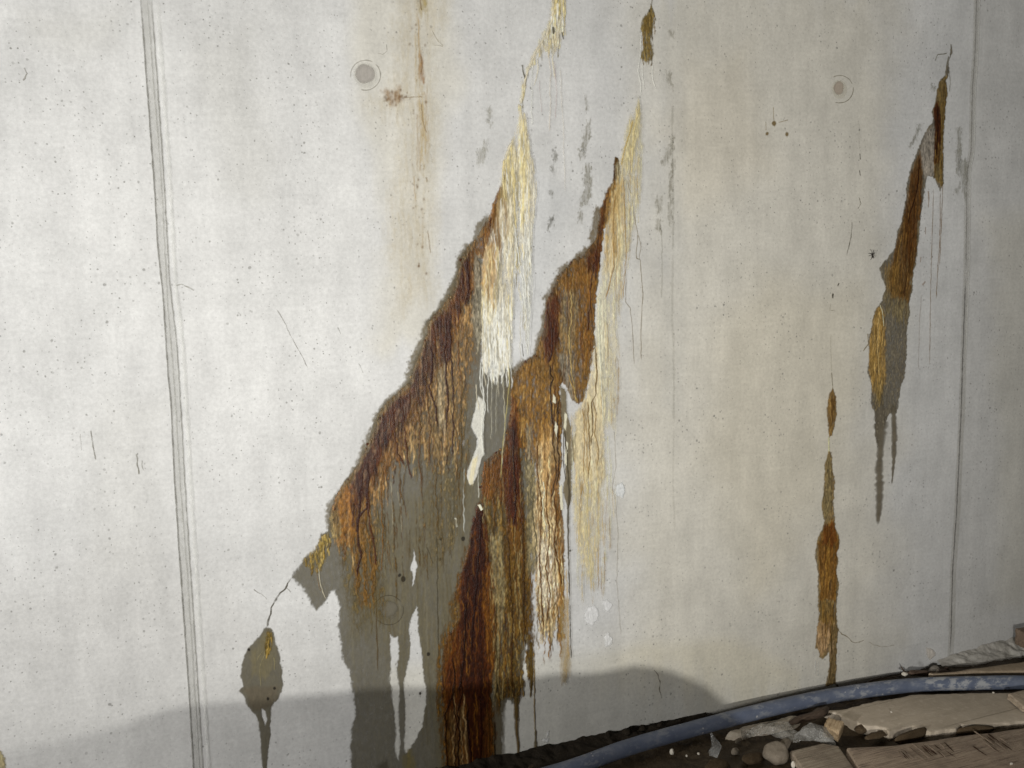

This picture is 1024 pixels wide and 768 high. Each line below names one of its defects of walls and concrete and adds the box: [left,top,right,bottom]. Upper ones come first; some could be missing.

rust [386,89,408,106]
rust [638,3,656,88]
rust [864,46,952,522]
rust [304,157,620,767]
rust [815,373,839,687]
crack [267,583,288,626]
leakage [240,628,283,768]